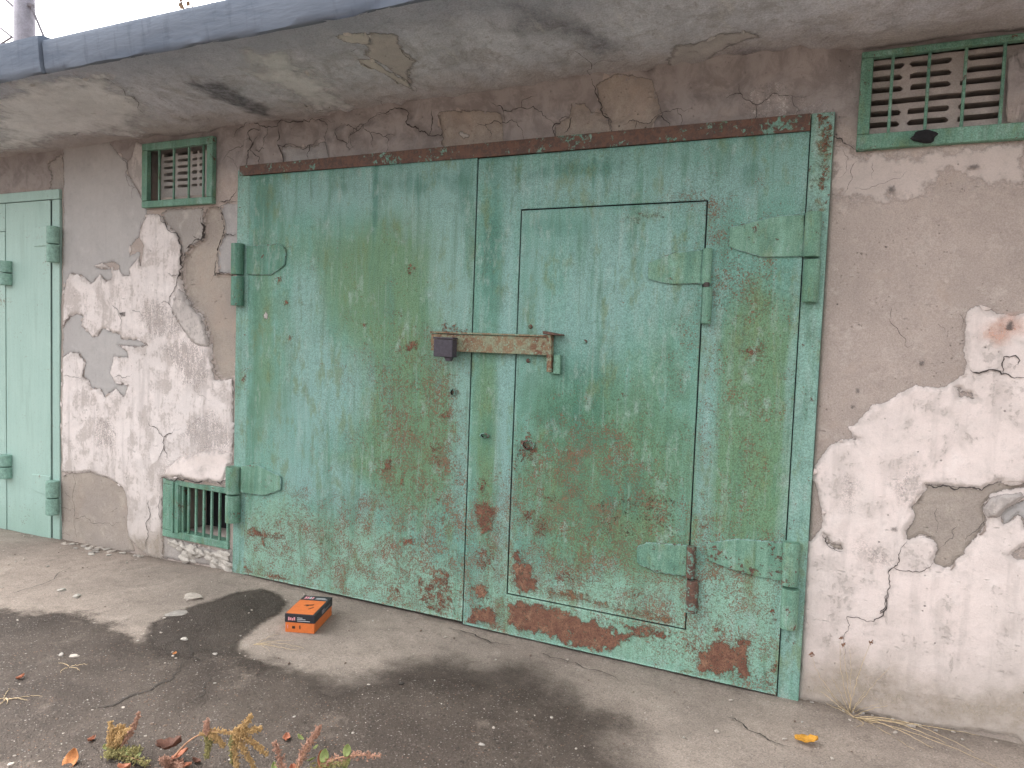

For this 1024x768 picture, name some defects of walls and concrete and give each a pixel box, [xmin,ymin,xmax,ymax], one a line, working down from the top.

peeling [336,32,416,91]
crack [477,96,572,140]
crack [561,50,686,128]
crack [116,48,446,332]
peeling [0,74,237,565]
crack [145,423,225,553]
corrosion [466,551,679,653]
corrosion [682,622,777,685]
peeling [799,305,1024,743]
crack [843,481,1000,654]